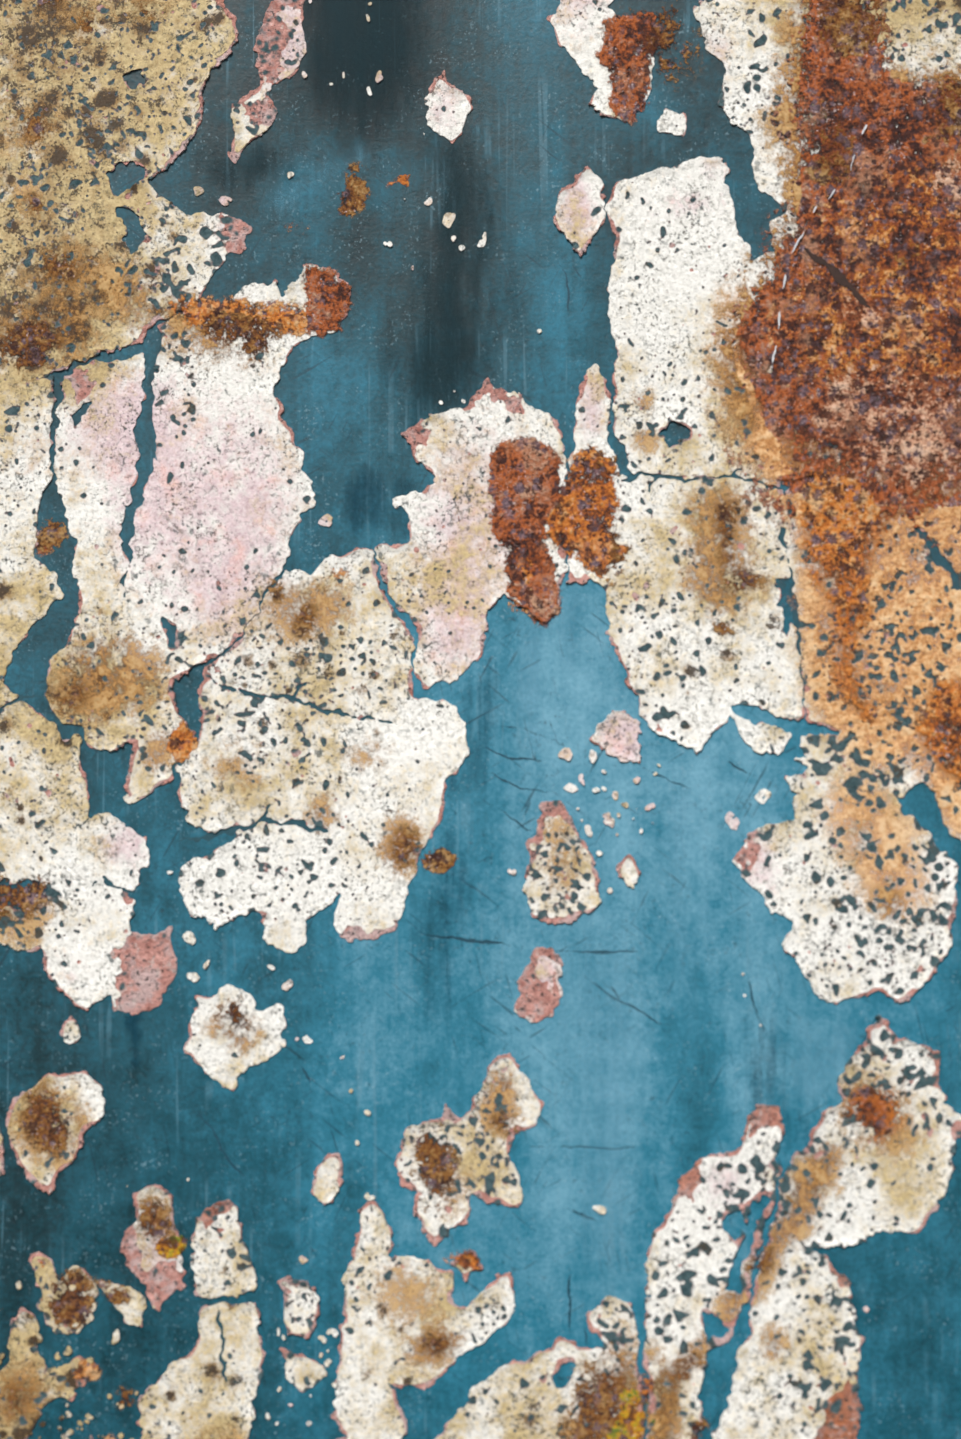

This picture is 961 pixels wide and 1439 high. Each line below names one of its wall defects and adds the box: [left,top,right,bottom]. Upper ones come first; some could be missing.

corrosion [0,240,353,370]
peeling [0,0,961,1091]
corrosion [487,436,632,627]
corrosion [635,430,659,454]
crack [617,468,805,697]
corrosion [680,0,961,919]
crack [910,518,961,591]
crack [200,671,397,725]
peeling [435,1015,961,1439]
corrosion [712,1071,925,1322]
corrosion [557,1330,709,1439]
corrosion [761,1323,790,1360]